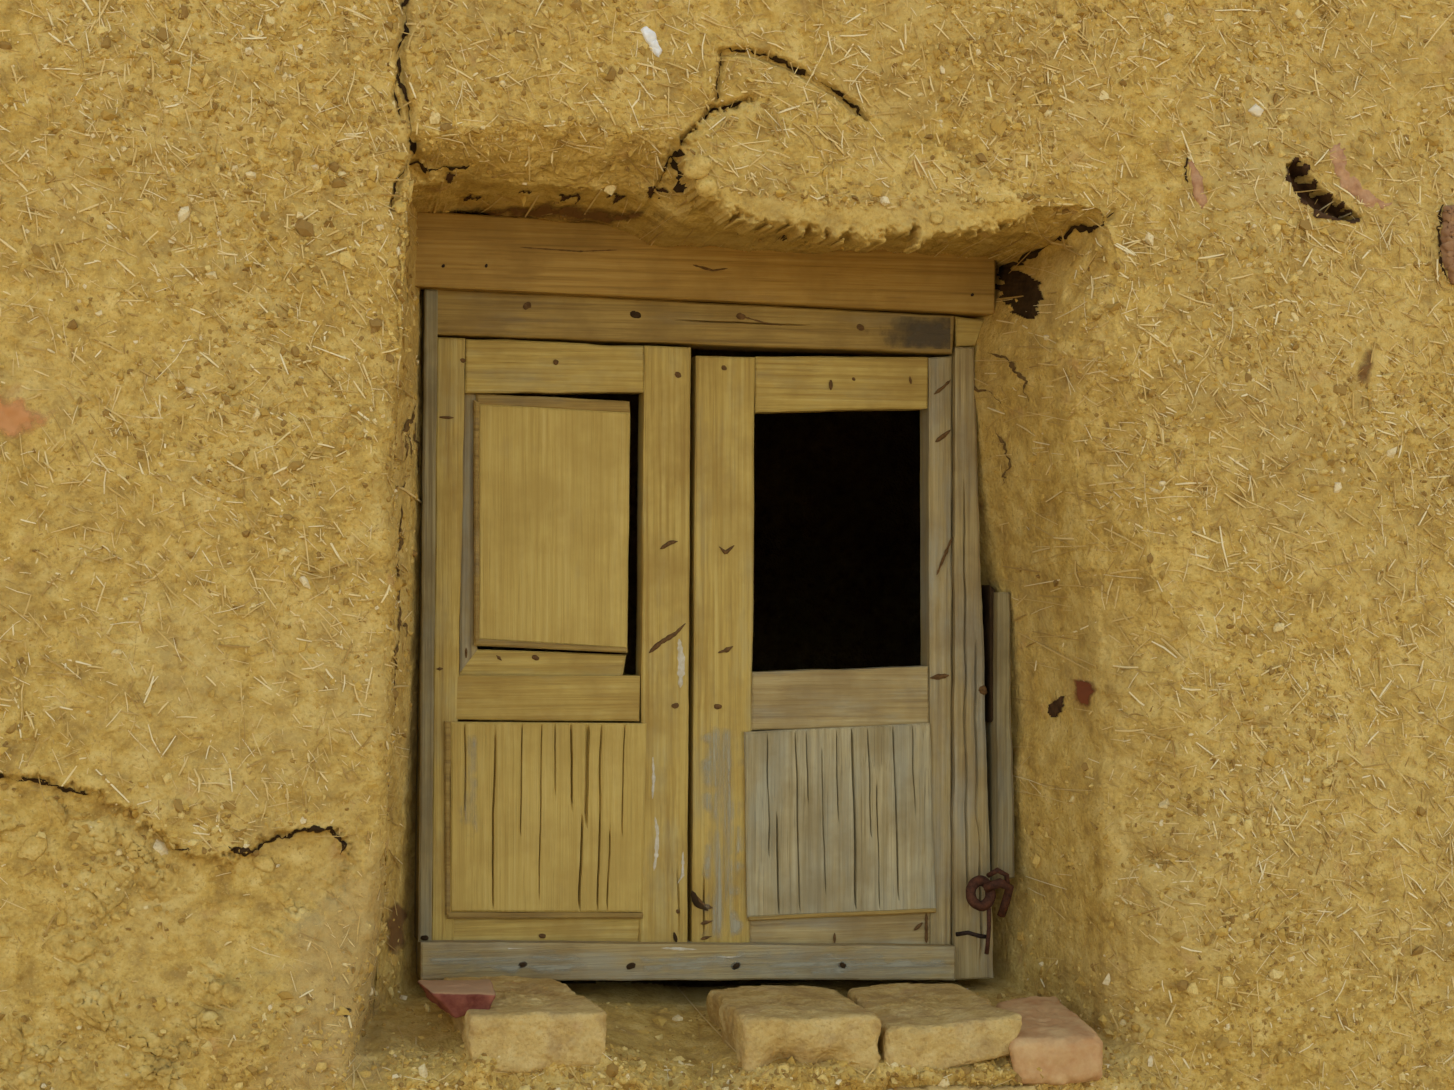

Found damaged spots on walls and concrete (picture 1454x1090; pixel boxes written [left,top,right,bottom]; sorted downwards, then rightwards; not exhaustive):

crack [391,0,469,207]
crack [658,48,861,193]
crack [393,405,420,716]
crack [0,773,89,795]
crack [228,825,347,857]